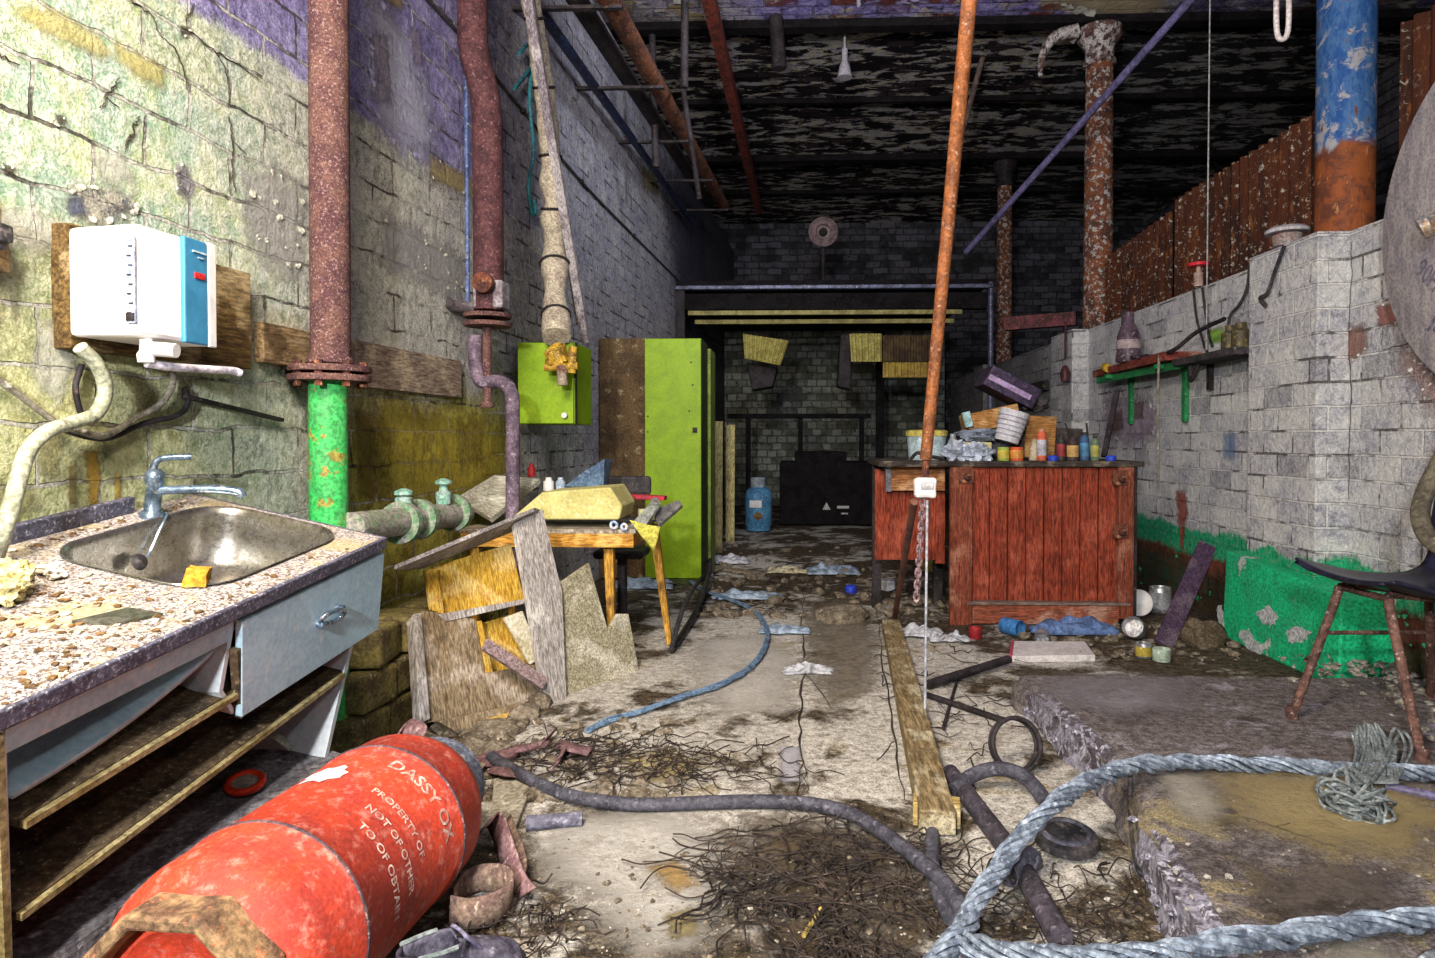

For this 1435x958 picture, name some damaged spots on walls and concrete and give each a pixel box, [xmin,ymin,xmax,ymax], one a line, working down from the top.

crack [99,78,140,149]
crack [131,0,259,192]
peeling [1052,0,1165,17]
crack [776,588,831,796]